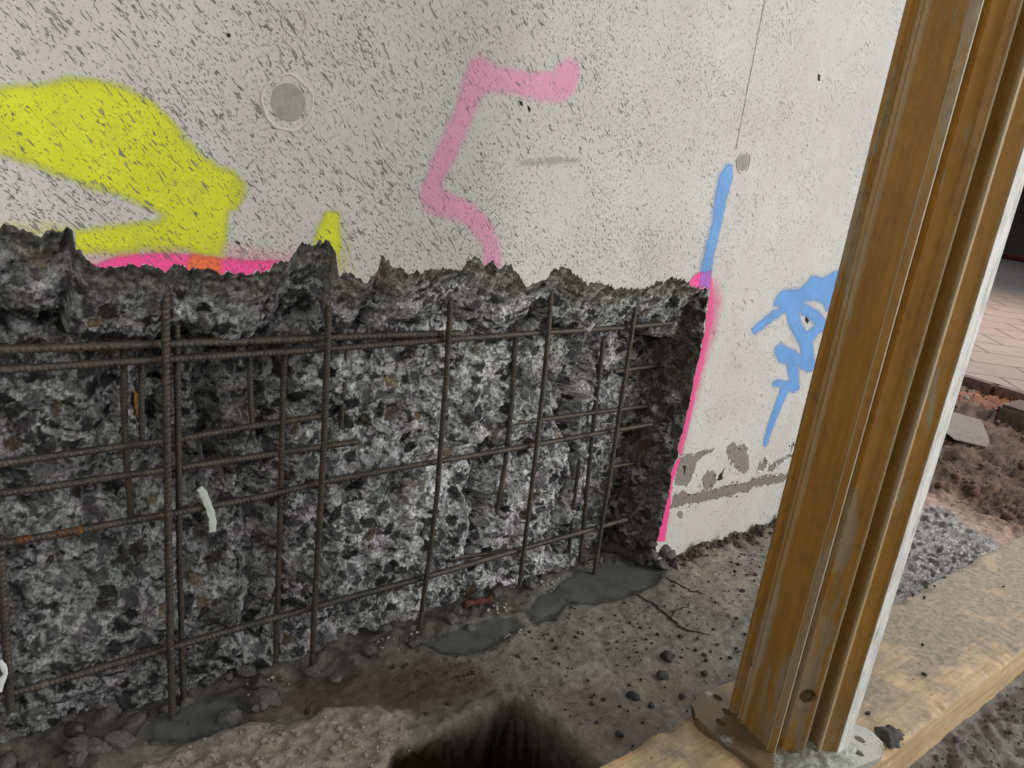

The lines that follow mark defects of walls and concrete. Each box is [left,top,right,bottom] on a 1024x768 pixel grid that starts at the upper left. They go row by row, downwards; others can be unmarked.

spalling [0,224,796,743]